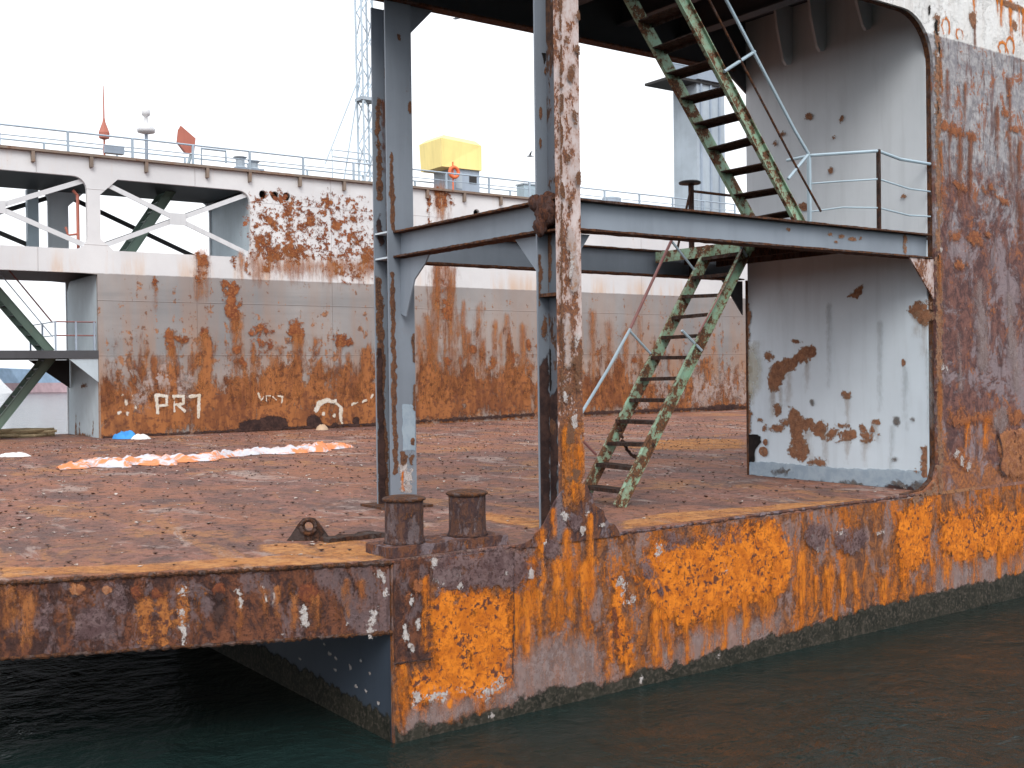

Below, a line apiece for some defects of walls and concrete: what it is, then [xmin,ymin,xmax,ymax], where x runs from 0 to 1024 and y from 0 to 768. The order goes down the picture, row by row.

corrosion [75,99,415,504]
corrosion [411,0,915,527]
corrosion [606,0,1024,675]
corrosion [1,541,381,648]
corrosion [400,543,596,725]